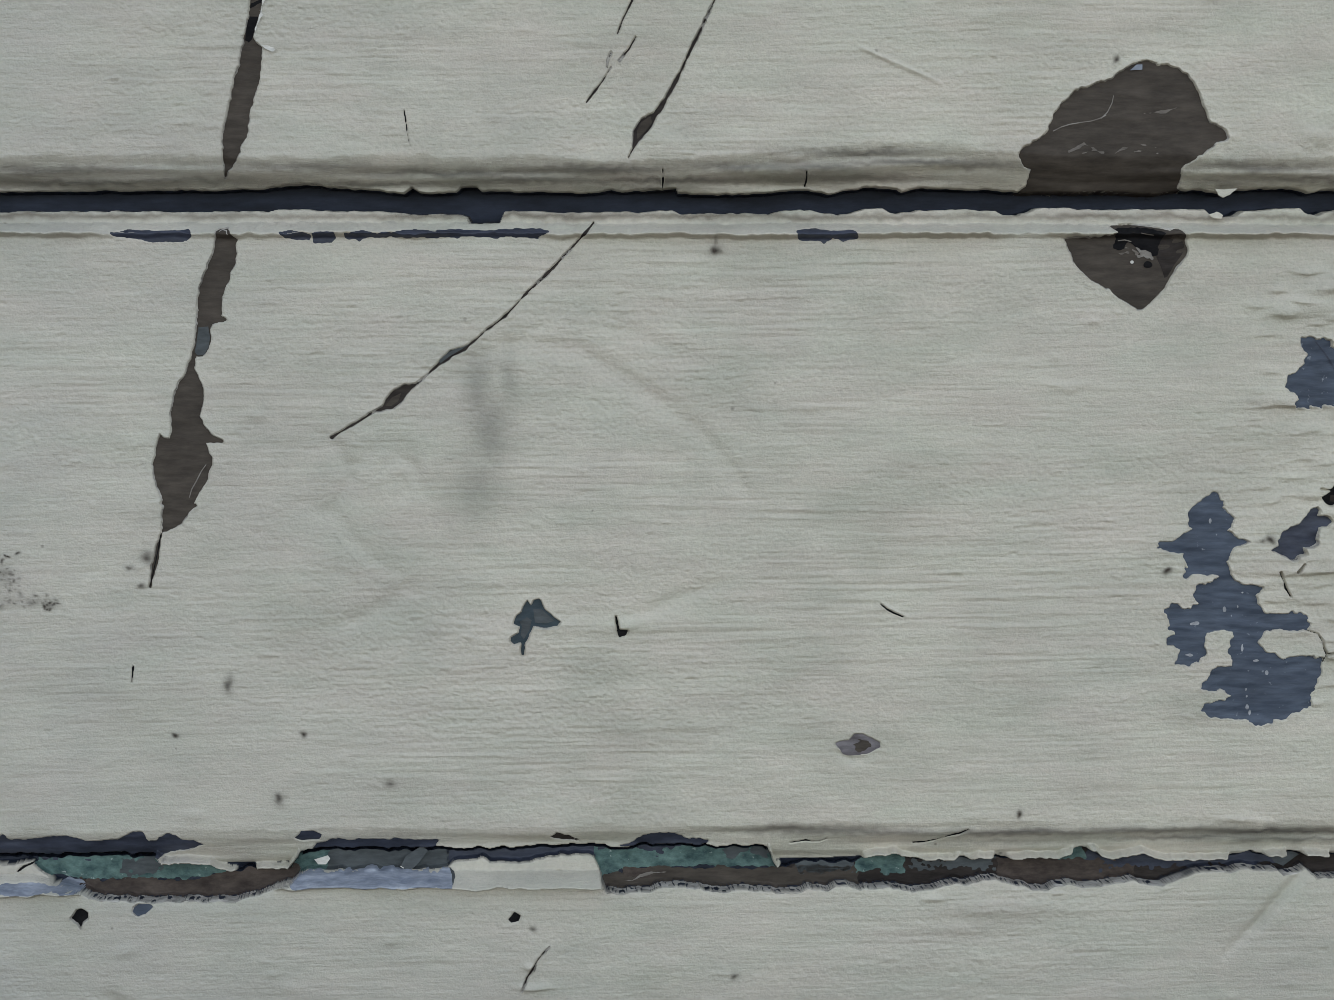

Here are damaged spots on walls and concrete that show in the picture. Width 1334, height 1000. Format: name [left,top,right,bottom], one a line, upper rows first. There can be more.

crack [586,0,636,103]
crack [628,0,715,158]
peeling [1012,60,1229,197]
peeling [1209,188,1237,219]
peeling [1064,224,1188,311]
crack [330,222,594,440]
peeling [1245,336,1334,432]
peeling [1271,479,1334,598]
peeling [511,599,560,655]
peeling [1157,492,1323,726]
peeling [835,734,880,756]
spalling [0,831,1334,927]